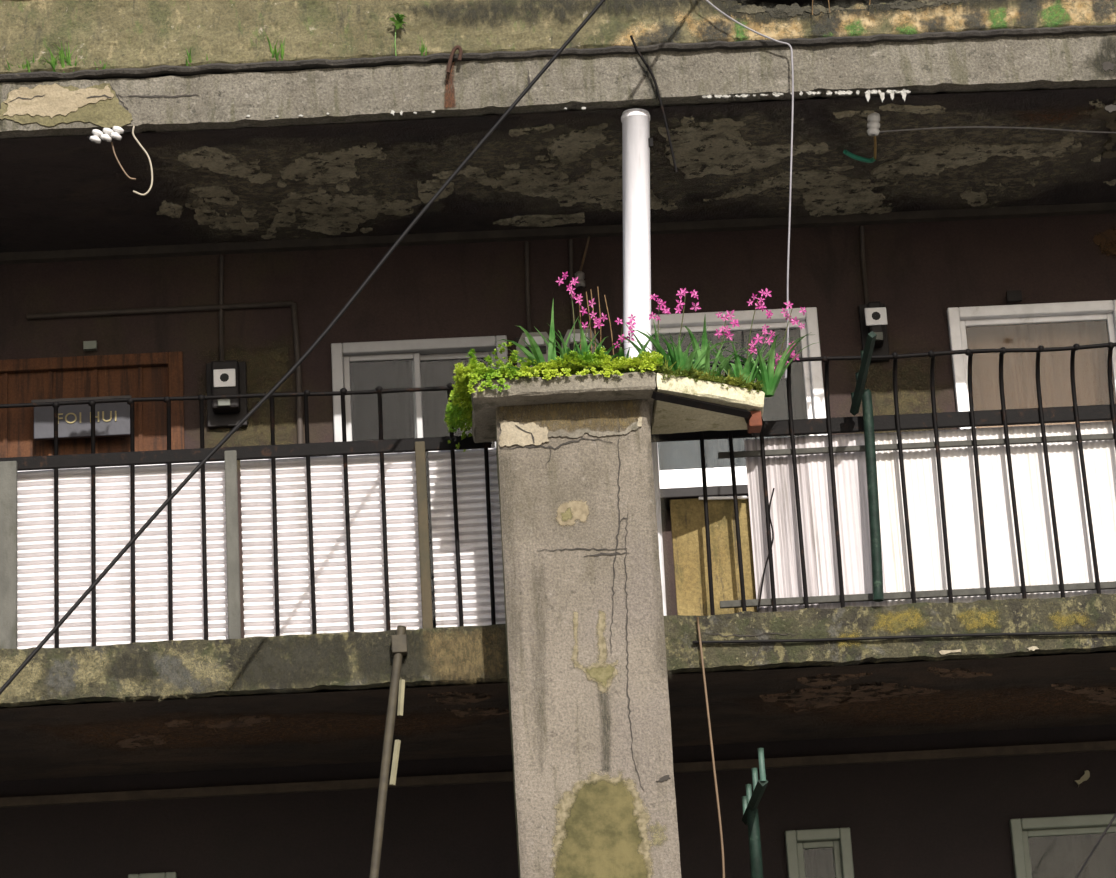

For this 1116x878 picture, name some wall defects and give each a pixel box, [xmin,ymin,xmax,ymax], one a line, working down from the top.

leakage [413,0,1062,42]
peeling [675,0,1025,42]
peeling [0,83,133,128]
rust [445,62,455,108]
leakage [637,25,681,102]
flaking render [142,107,623,240]
flaking render [650,89,1116,217]
crack [500,424,670,790]
leakage [0,656,42,701]
leakage [74,631,422,698]
leakage [26,713,505,751]
spalling [551,772,653,878]